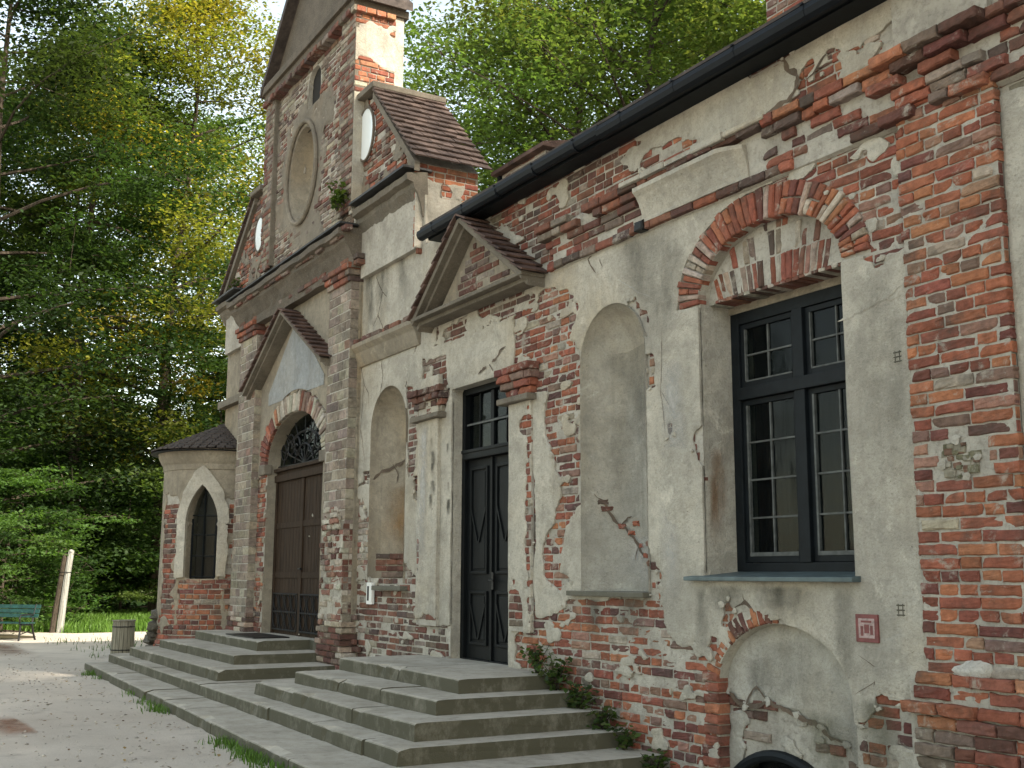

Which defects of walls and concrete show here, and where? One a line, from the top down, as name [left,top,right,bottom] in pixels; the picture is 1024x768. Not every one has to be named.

crack [767,53,827,113]
flaking render [792,34,882,102]
flaking render [489,137,697,264]
flaking render [803,132,904,268]
flaking render [153,504,234,646]
flaking render [309,500,449,657]
crack [358,460,405,485]
flaking render [423,287,581,590]
flaking render [515,562,718,768]
crack [594,494,651,566]
flaking render [718,596,737,627]
flaking render [726,687,778,750]